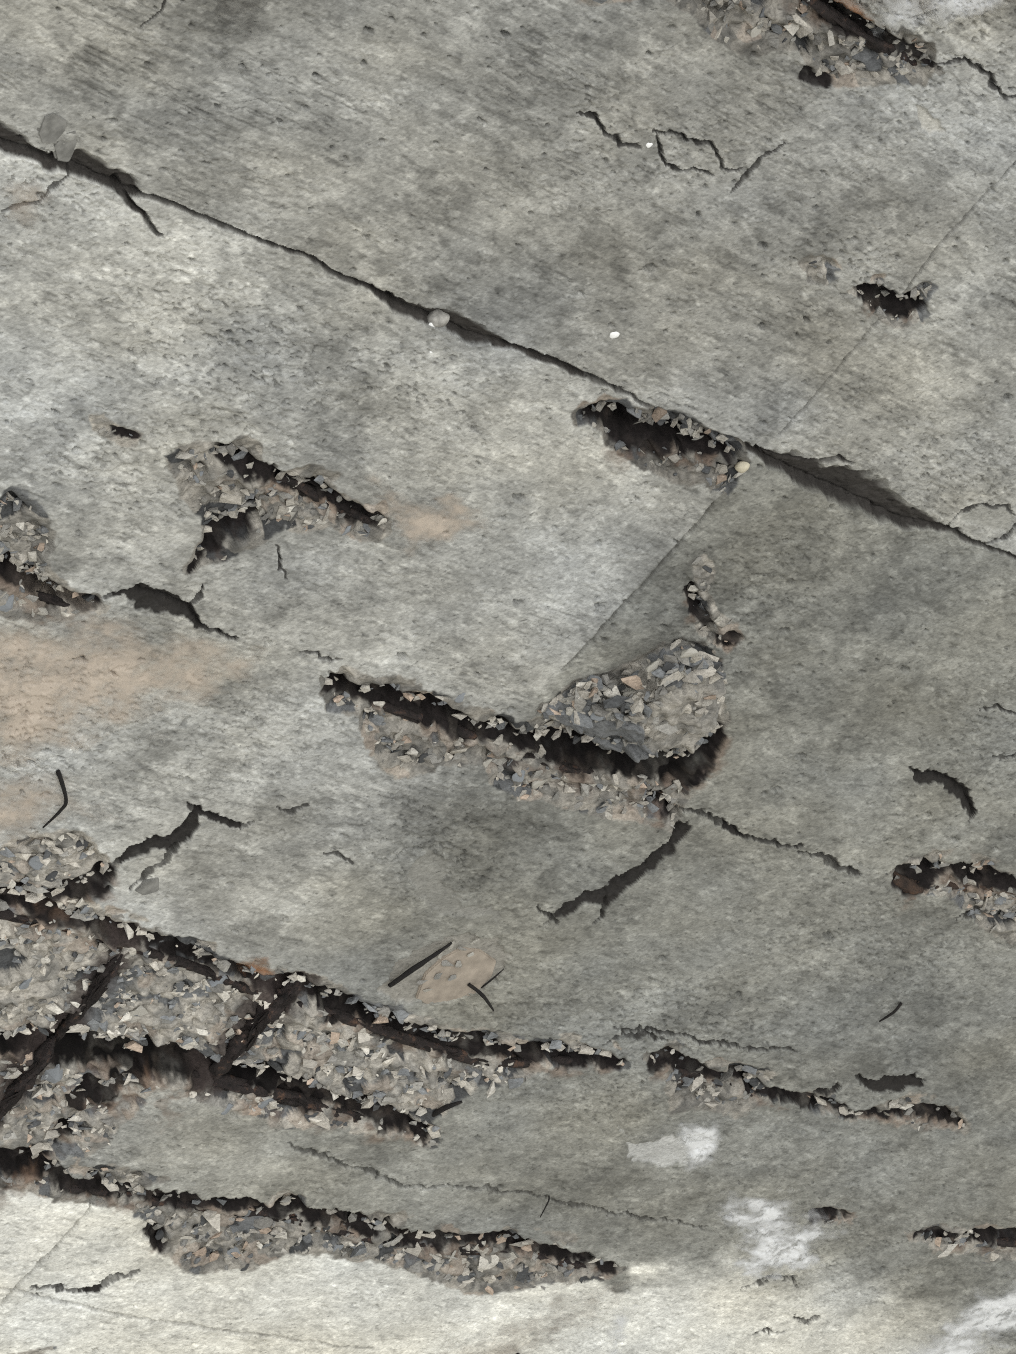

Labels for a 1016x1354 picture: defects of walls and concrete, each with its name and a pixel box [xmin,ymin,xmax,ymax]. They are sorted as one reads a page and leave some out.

spalling [664,0,945,89]
crack [931,55,1016,102]
crack [576,111,787,196]
spalling [571,393,751,496]
spalling [0,486,110,624]
spalling [164,435,392,576]
crack [948,502,1016,545]
crack [100,582,240,643]
spalling [318,665,731,833]
crack [908,765,978,824]
crack [536,803,863,926]
spalling [0,828,971,1296]